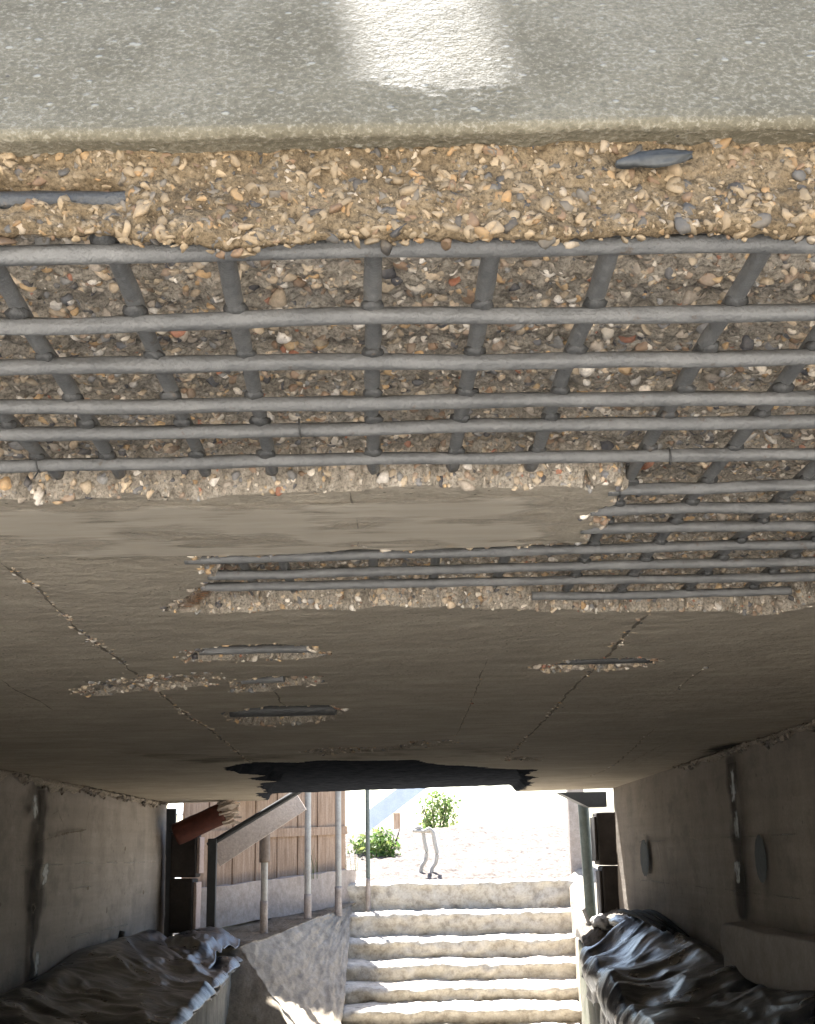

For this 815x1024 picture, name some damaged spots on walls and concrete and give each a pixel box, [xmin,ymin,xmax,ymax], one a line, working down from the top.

spalling [0,138,815,318]
spalling [46,332,145,357]
spalling [381,324,470,354]
spalling [483,324,574,354]
spalling [584,323,708,352]
spalling [379,370,461,395]
spalling [568,367,682,392]
spalling [0,429,815,616]
crack [1,563,252,762]
spalling [68,643,335,698]
crack [503,612,651,761]
spalling [224,760,538,800]